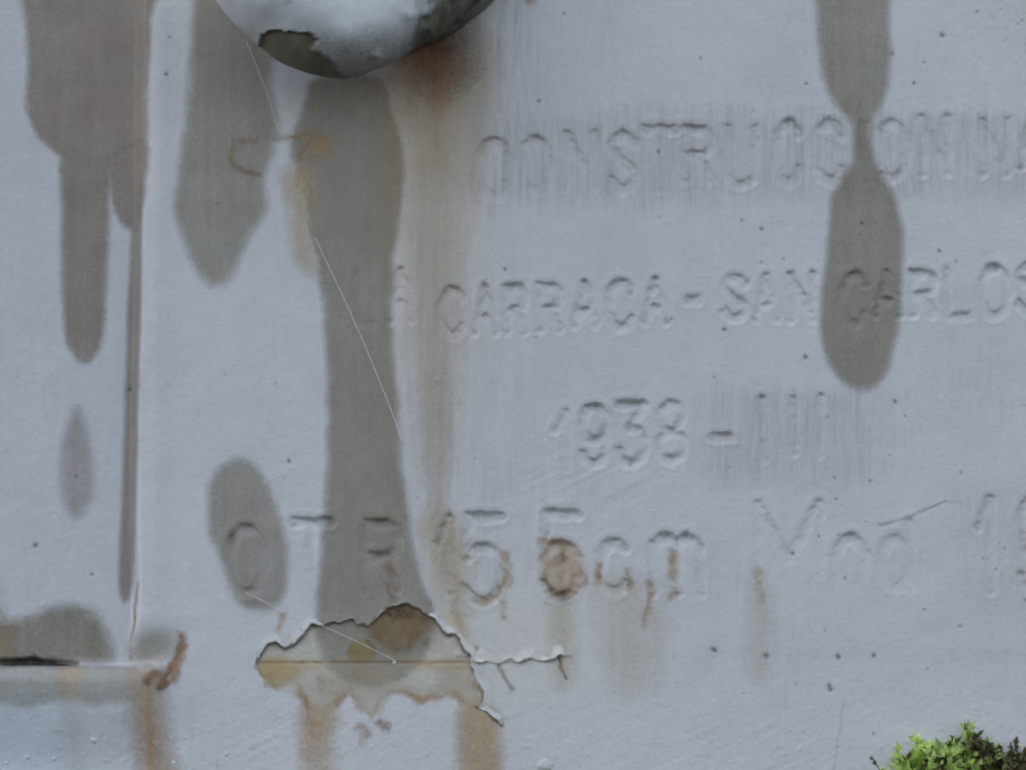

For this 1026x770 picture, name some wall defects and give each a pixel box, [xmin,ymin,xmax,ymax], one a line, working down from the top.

water stain [811,0,908,395]
water stain [18,0,158,605]
water stain [169,0,440,693]
water stain [0,599,182,712]
rust [119,630,189,770]
peeling [254,600,568,748]
rust [451,694,507,770]
rust [536,534,605,695]